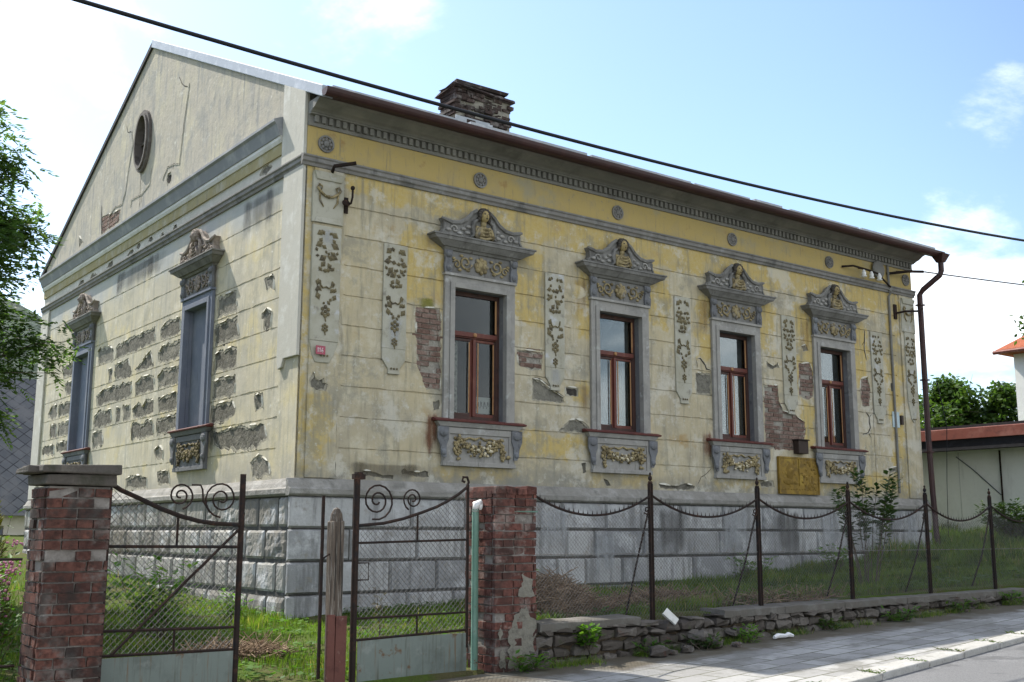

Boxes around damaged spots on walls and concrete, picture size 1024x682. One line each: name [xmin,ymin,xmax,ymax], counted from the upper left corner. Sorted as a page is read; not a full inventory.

flaking render [102,209,121,234]
flaking render [92,316,181,491]
flaking render [209,290,272,479]
flaking render [412,306,443,410]
flaking render [516,348,578,403]
flaking render [695,371,711,396]
flaking render [763,384,806,451]
flaking render [859,376,871,407]